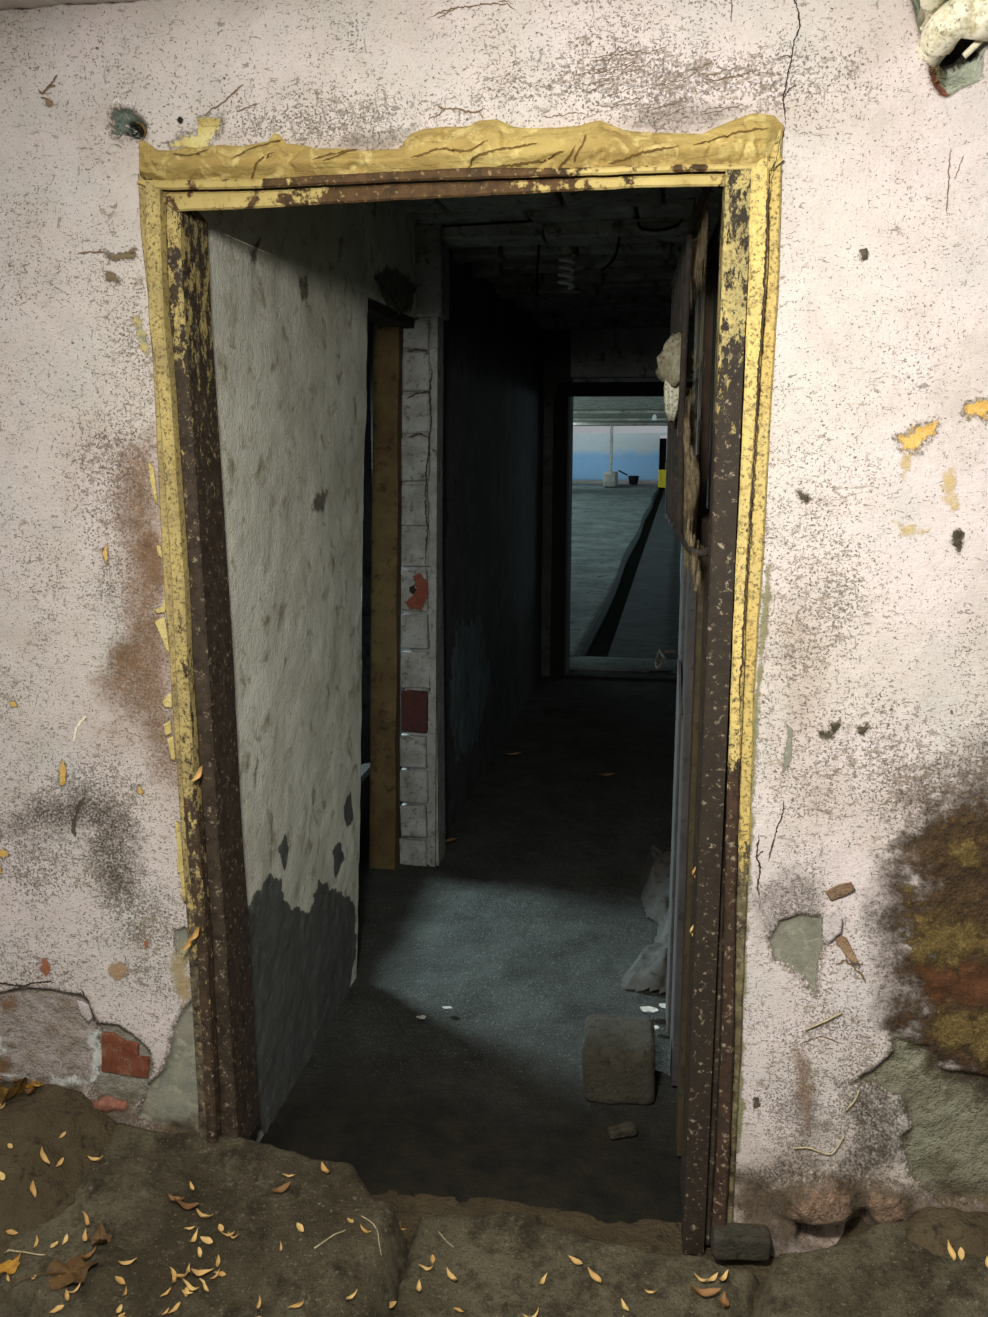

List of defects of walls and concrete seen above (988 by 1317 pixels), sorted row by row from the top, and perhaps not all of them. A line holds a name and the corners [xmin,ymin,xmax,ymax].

spalling [108,107,149,140]
peeling [133,315,149,356]
crack [542,0,801,721]
peeling [148,462,158,504]
peeling [154,597,169,653]
spalling [405,573,428,610]
peeling [162,693,176,762]
peeling [175,820,186,904]
water stain [870,771,988,1088]
flaking render [87,926,199,1133]
flaking render [841,1031,988,1205]